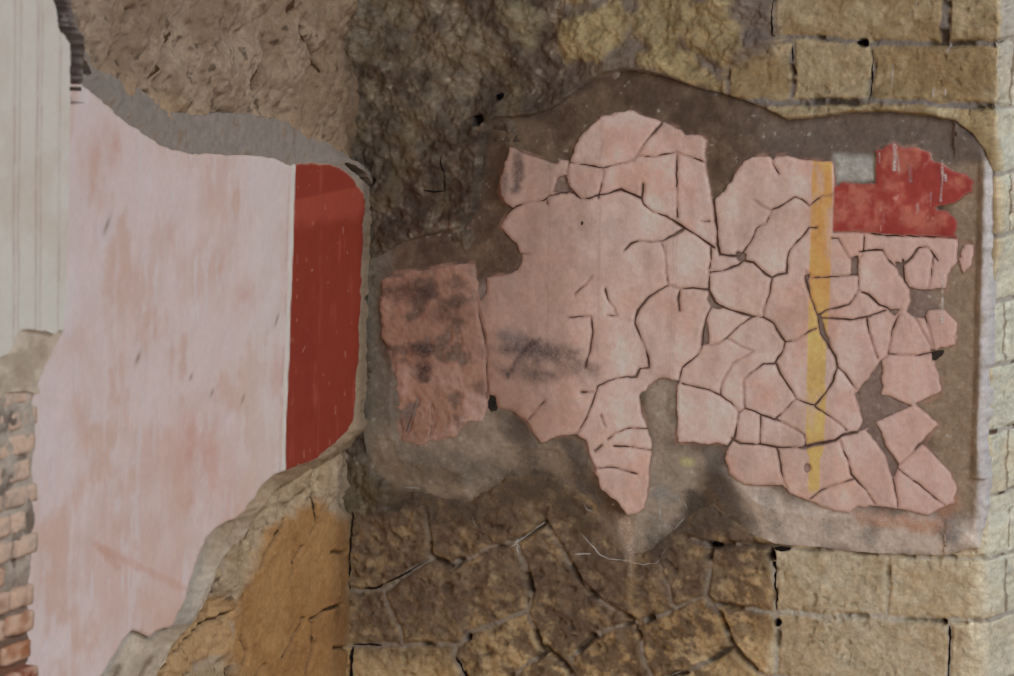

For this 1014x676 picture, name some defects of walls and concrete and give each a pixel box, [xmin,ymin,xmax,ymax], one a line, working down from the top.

crack [424,155,446,193]
flaking render [706,138,743,194]
flaking render [835,158,874,183]
flaking render [481,230,519,280]
flaking render [908,289,944,317]
crack [556,189,953,499]
flaking render [640,380,676,441]
flaking render [856,361,908,425]
crack [297,512,429,676]
crack [772,546,791,610]